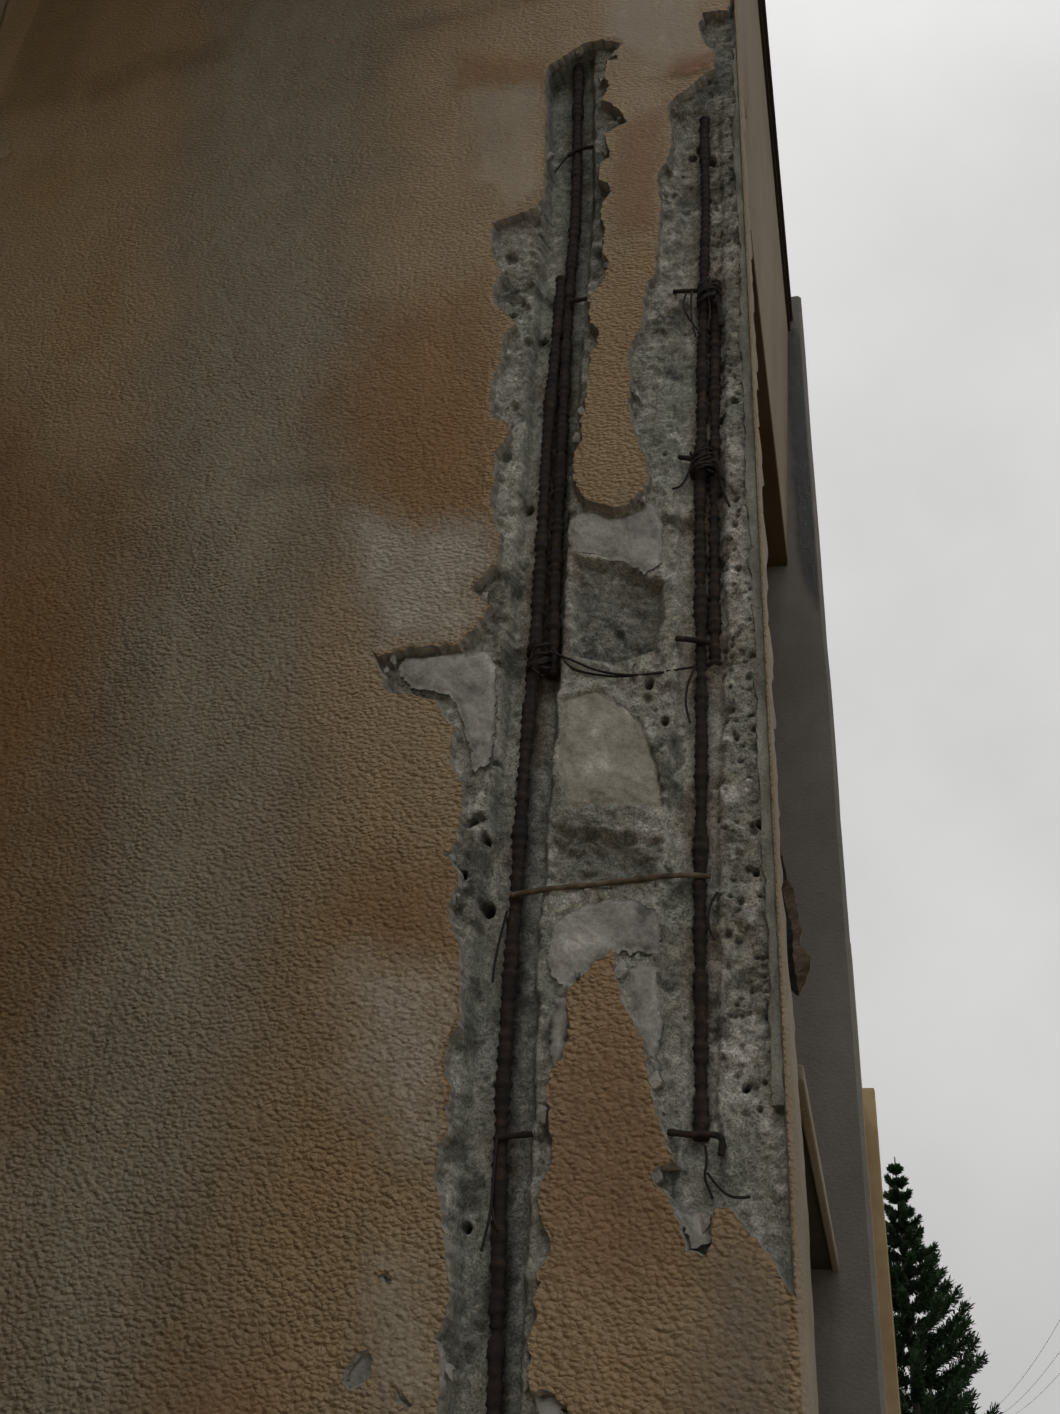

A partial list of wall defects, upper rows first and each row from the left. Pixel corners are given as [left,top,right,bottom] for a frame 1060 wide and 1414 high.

spalling [373,0,811,1414]